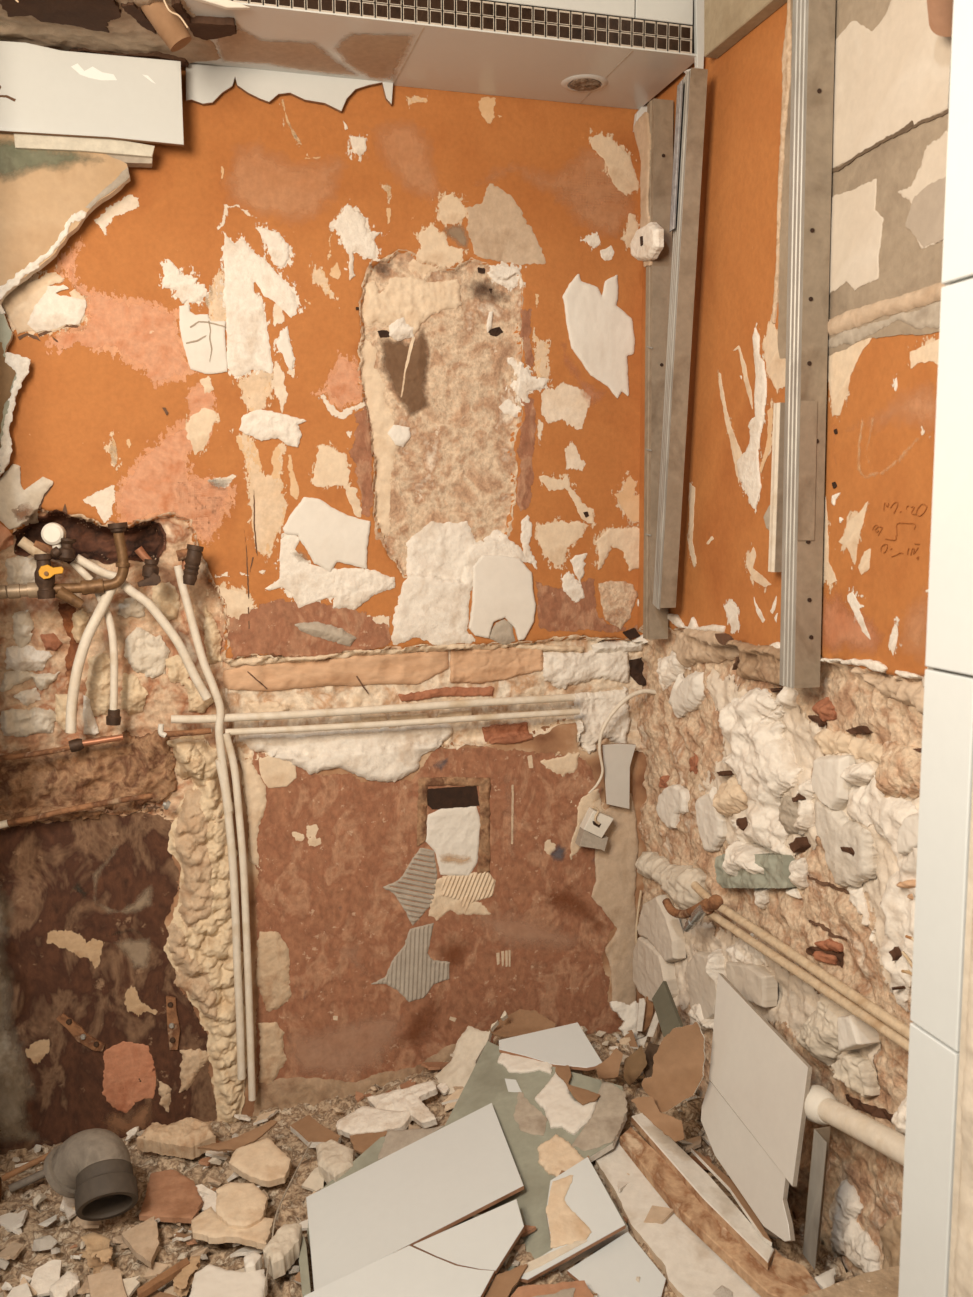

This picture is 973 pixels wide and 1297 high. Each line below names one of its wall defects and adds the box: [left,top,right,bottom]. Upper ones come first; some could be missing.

flaking render [0,0,428,161]
flaking render [835,0,891,41]
flaking render [748,0,793,463]
flaking render [827,108,949,422]
spalling [0,119,925,1027]
spalling [639,997,664,1045]
spalling [696,1029,713,1098]
spalling [768,1020,909,1131]
spalling [787,1119,904,1277]